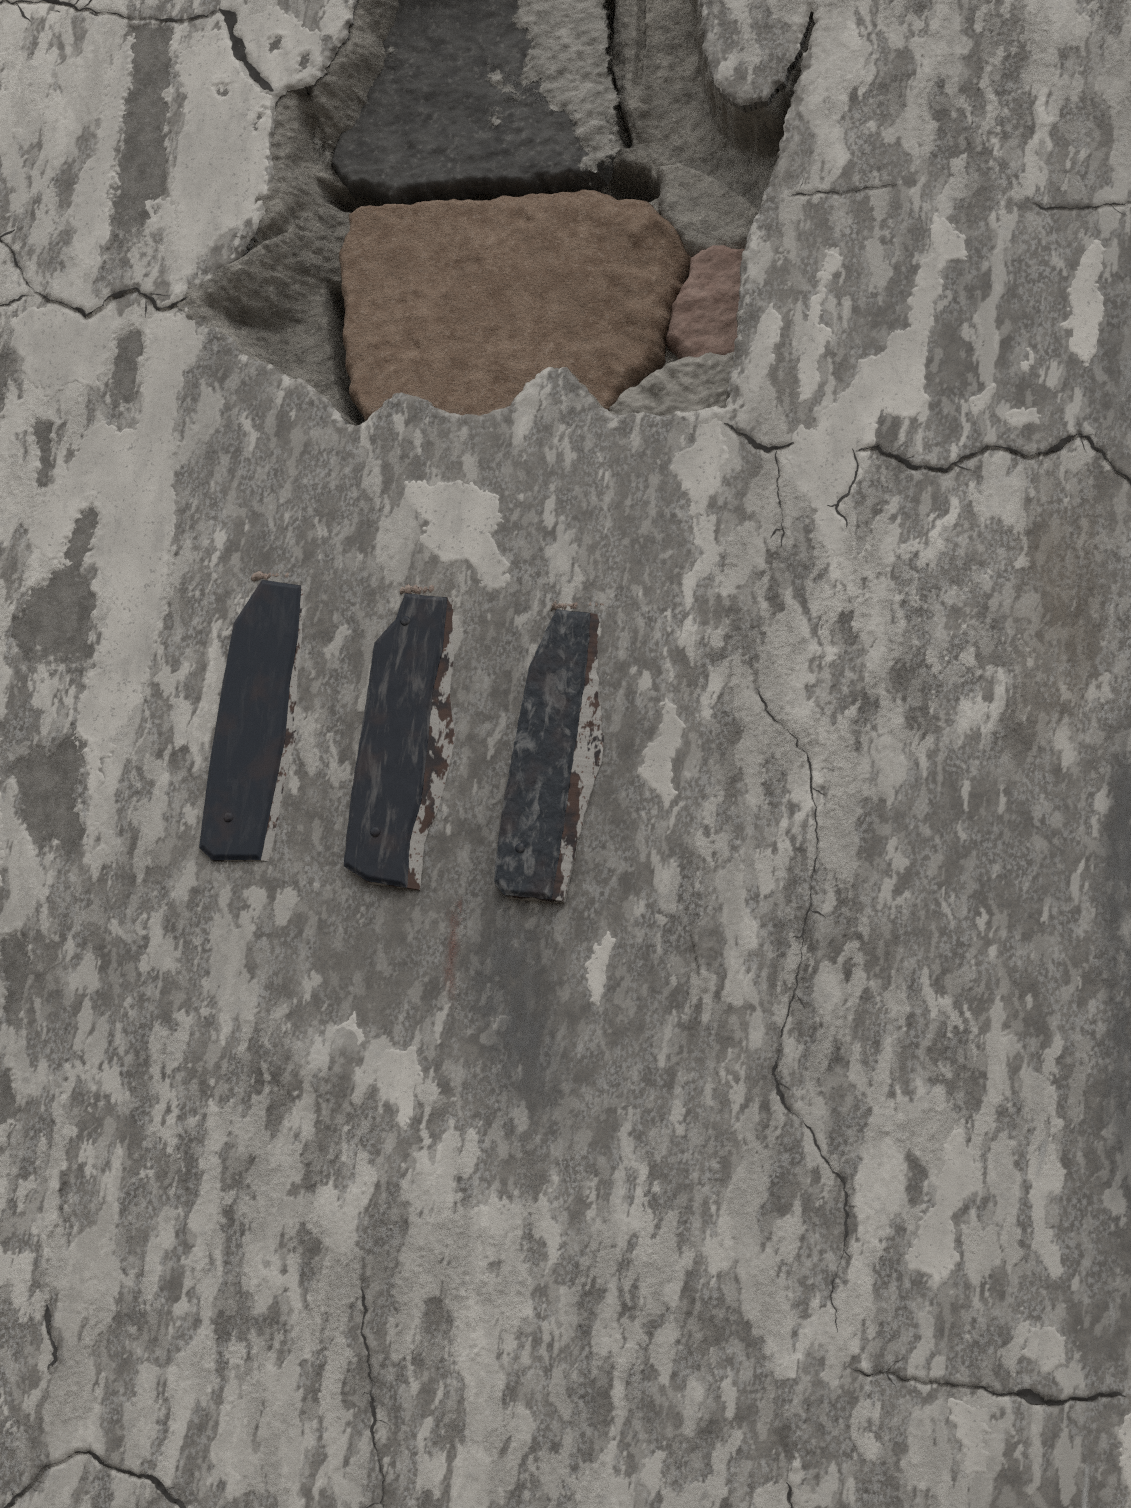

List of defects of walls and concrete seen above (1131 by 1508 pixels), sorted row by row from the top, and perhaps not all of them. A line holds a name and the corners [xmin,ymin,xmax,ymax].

crack [0,0,273,91]
crack [0,229,187,318]
peeling [785,213,968,564]
spalling [0,0,816,887]
crack [827,433,1131,527]
peeling [0,933,30,1031]
peeling [585,931,616,1007]
crack [756,688,854,1332]
peeling [0,1074,20,1124]
crack [361,1287,389,1508]
crack [850,1358,1124,1405]
crack [4,1451,186,1508]